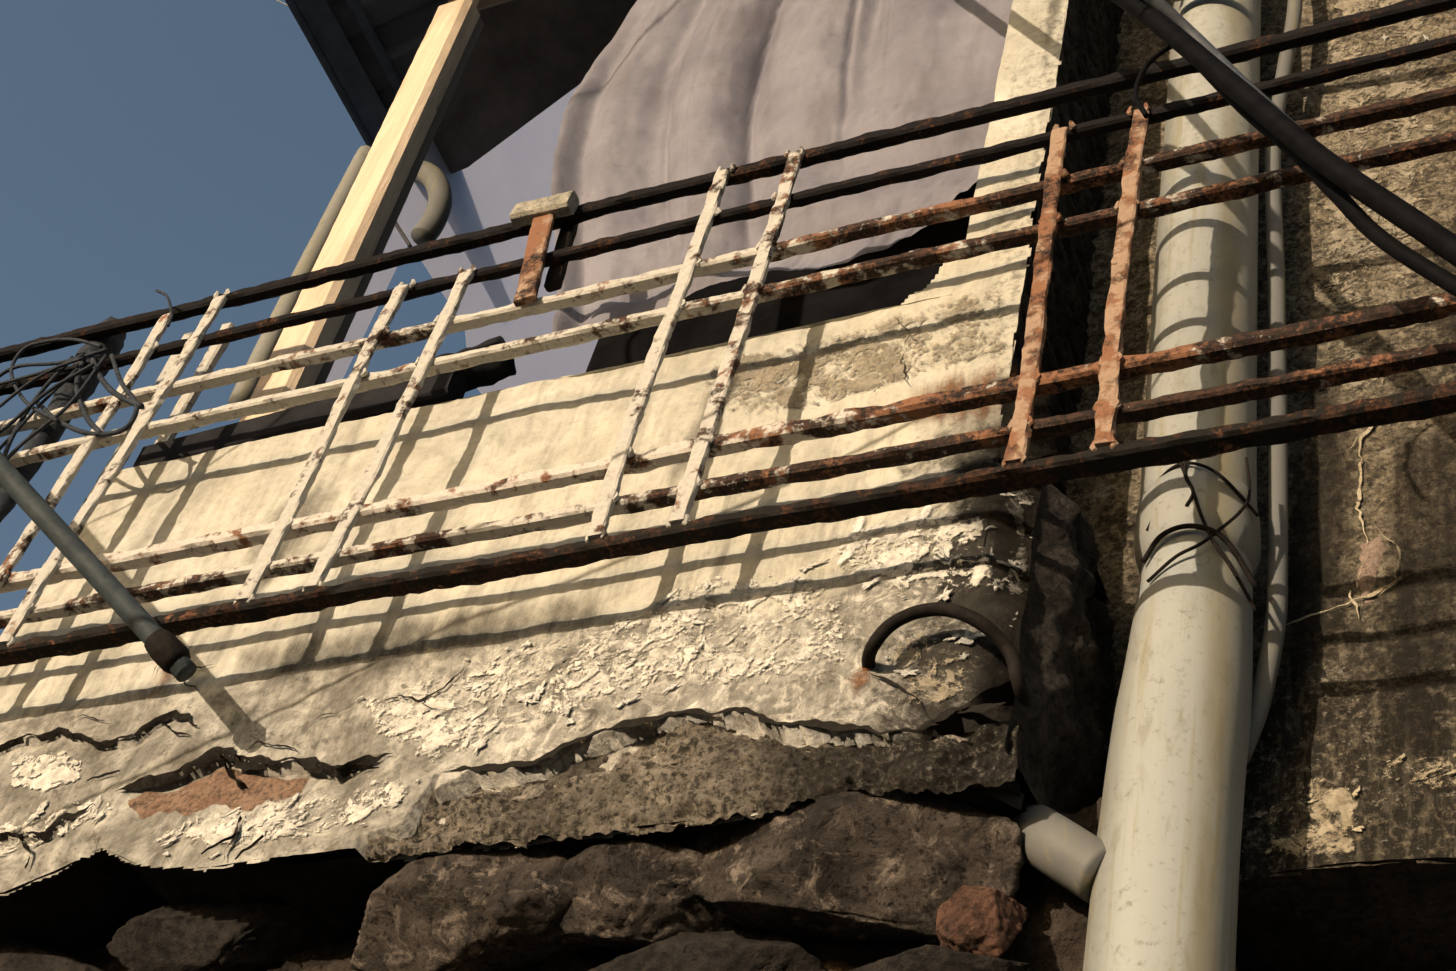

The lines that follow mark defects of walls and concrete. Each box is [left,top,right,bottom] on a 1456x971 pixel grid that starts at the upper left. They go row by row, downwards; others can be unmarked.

corrosion [923,372,995,395]
crack [0,664,467,869]
spalling [0,490,1034,862]
water stain [1288,433,1348,682]
water stain [1382,429,1456,746]